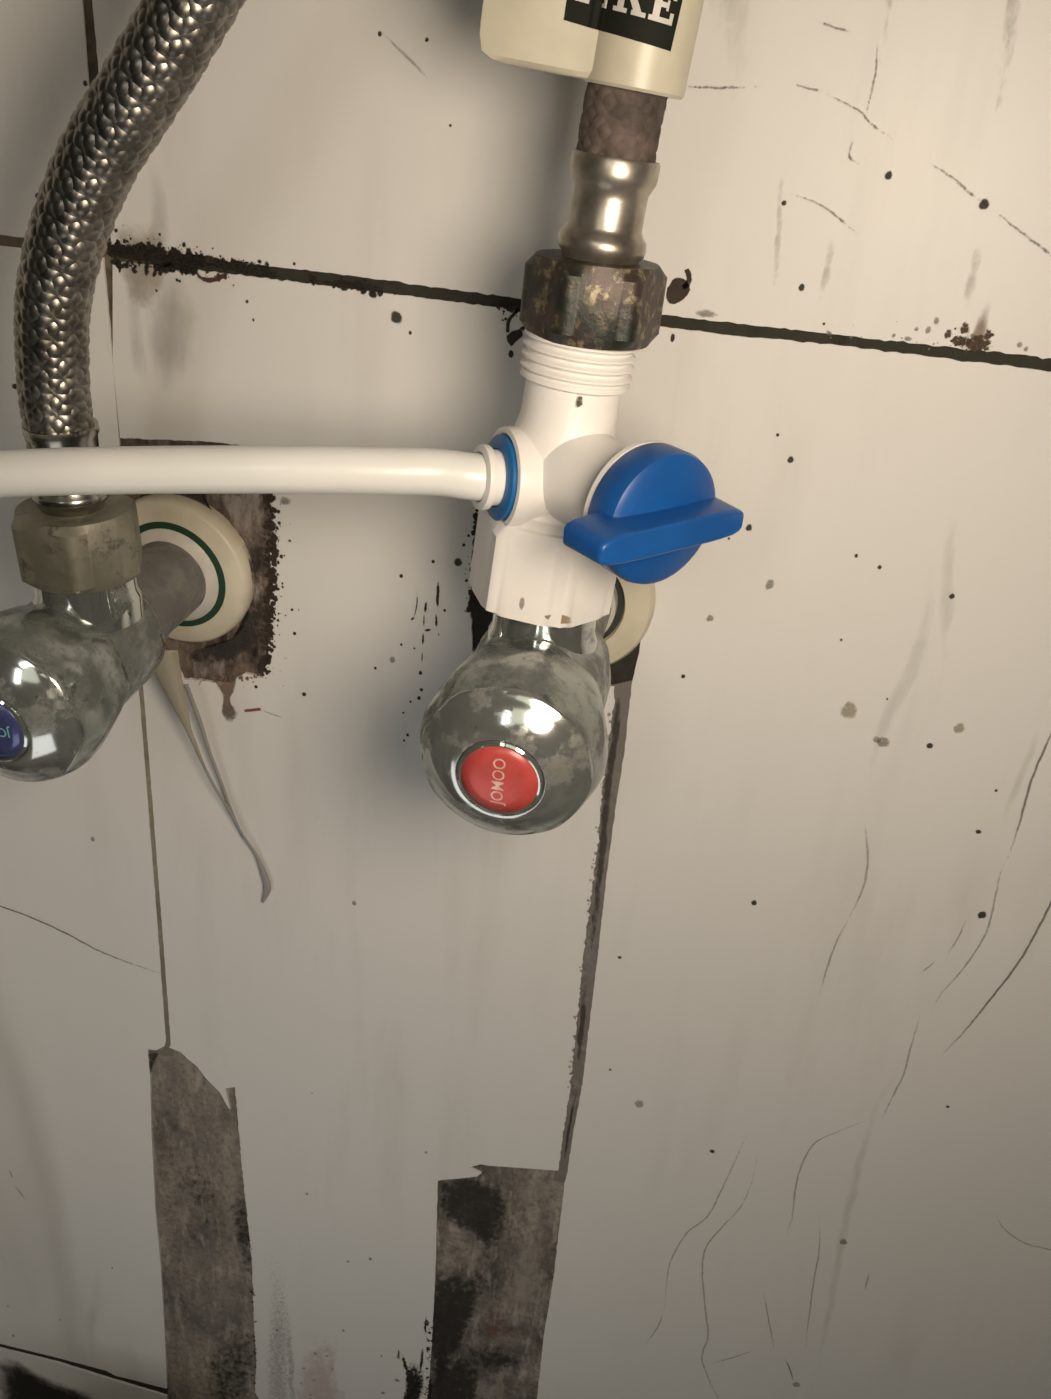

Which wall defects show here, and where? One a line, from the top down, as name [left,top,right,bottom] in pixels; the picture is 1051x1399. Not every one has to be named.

damp [107,225,276,292]
damp [309,274,383,298]
damp [666,269,692,304]
damp [496,301,525,358]
damp [217,679,235,718]
crack [0,906,118,959]
crack [968,902,1051,1027]
damp [577,1004,586,1057]
peeling [149,1047,259,1399]
peeling [424,1164,564,1399]